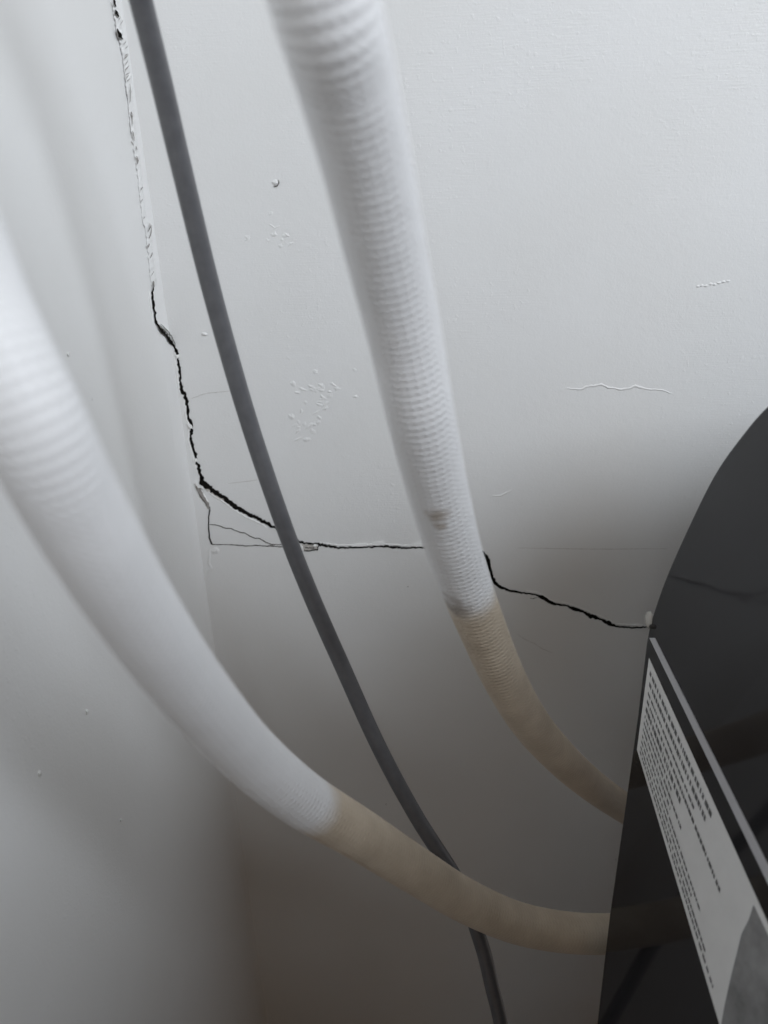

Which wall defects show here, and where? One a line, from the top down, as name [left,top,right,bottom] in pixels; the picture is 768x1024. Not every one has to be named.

crack [149,284,424,549]
crack [483,551,647,629]